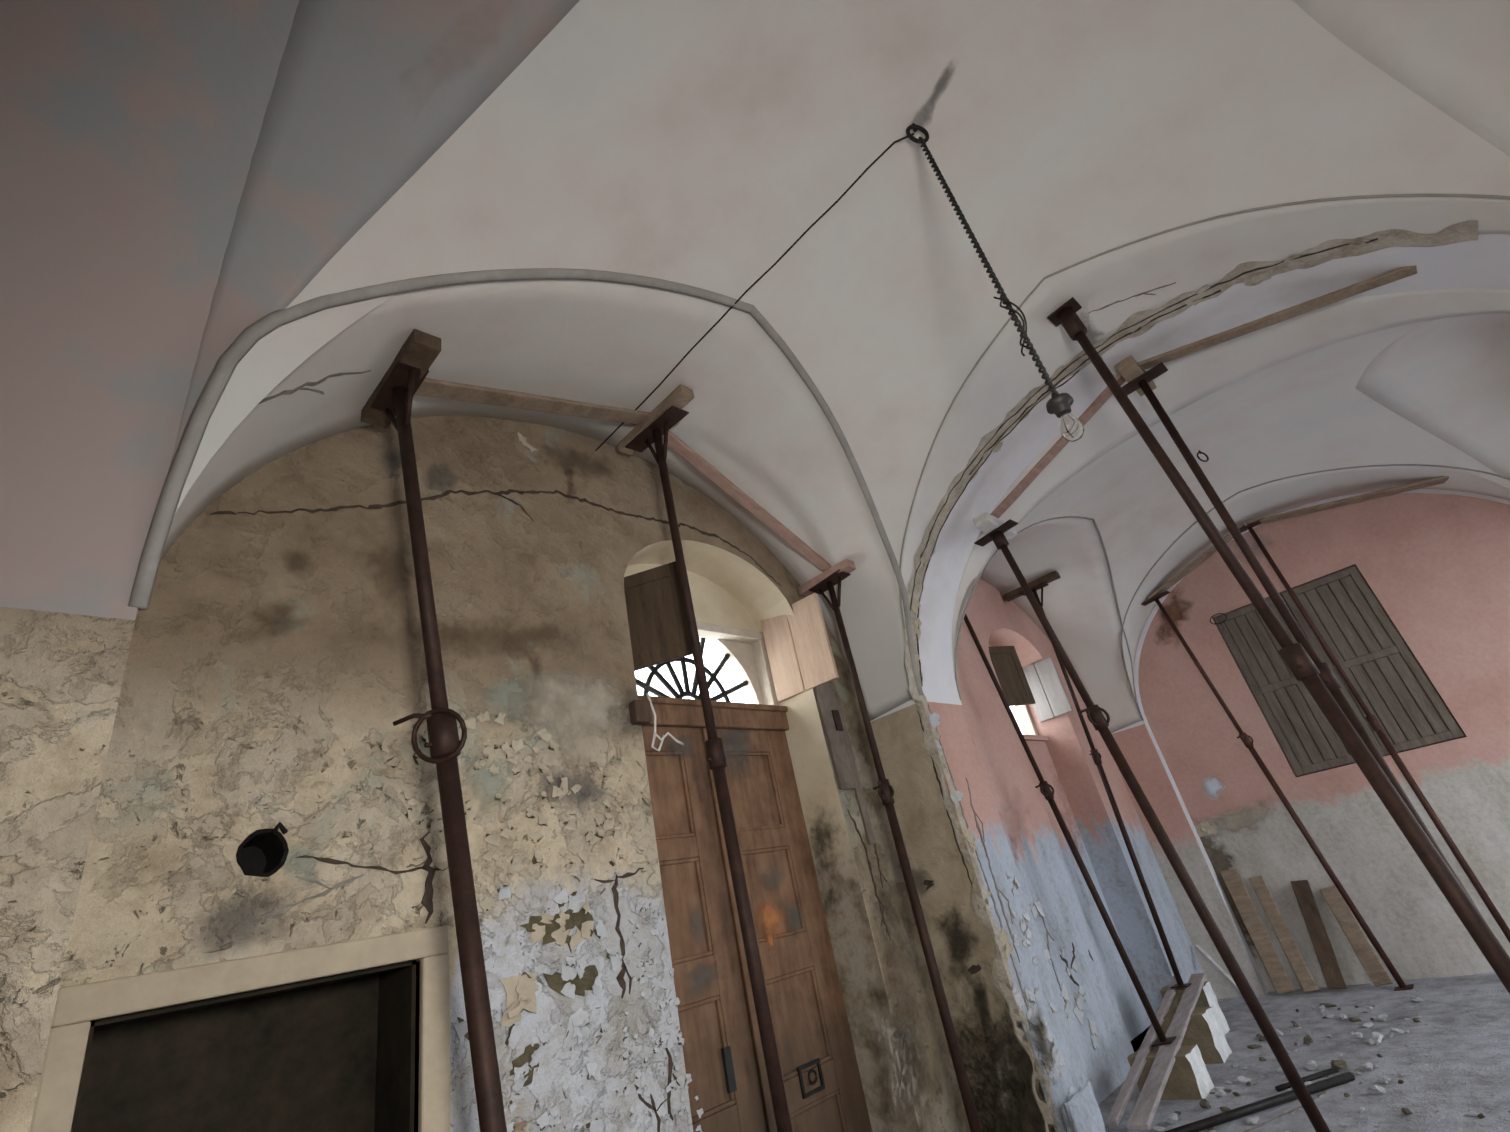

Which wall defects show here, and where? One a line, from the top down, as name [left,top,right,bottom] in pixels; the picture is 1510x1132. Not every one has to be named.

crack [210,489,782,587]
spalling [904,221,1478,1132]
peeling [379,724,429,769]
peeling [403,790,448,871]
crack [244,832,436,924]
peeling [458,711,704,1132]
spalling [453,1017,469,1040]